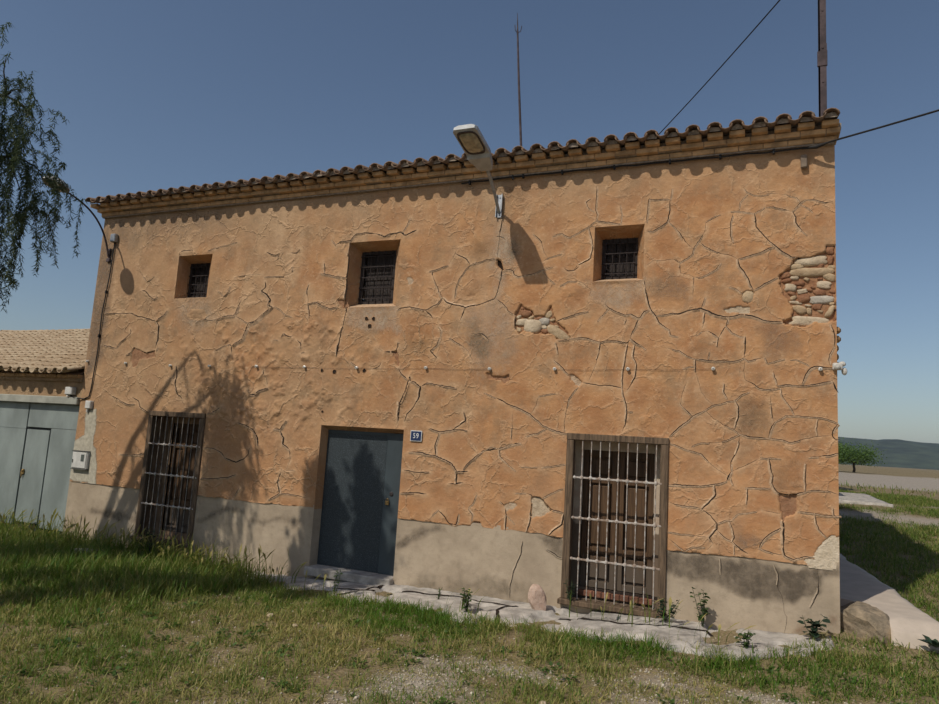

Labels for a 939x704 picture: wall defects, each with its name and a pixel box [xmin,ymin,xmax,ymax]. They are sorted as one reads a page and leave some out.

spalling [779,246,836,327]
crack [102,277,168,356]
crack [195,218,457,422]
spalling [515,305,570,340]
crack [171,366,181,397]
crack [113,396,149,414]
crack [335,186,842,633]
crack [200,421,305,501]
spalling [779,494,797,521]
peeling [804,535,839,571]
water stain [721,561,817,601]